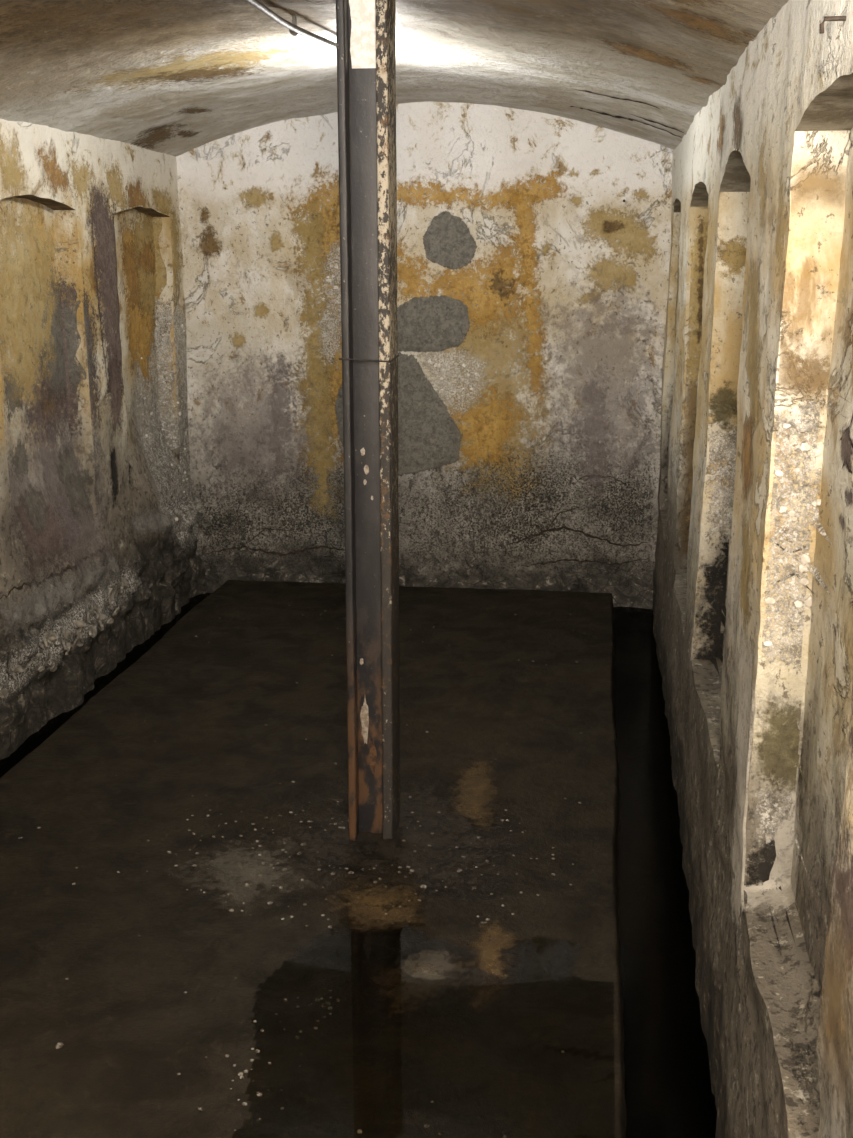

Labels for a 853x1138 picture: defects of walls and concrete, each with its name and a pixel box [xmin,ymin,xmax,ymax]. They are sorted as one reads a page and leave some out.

damp [401,0,652,35]
damp [12,445,99,577]
damp [131,300,345,580]
damp [399,441,658,586]
flaking render [0,556,149,706]